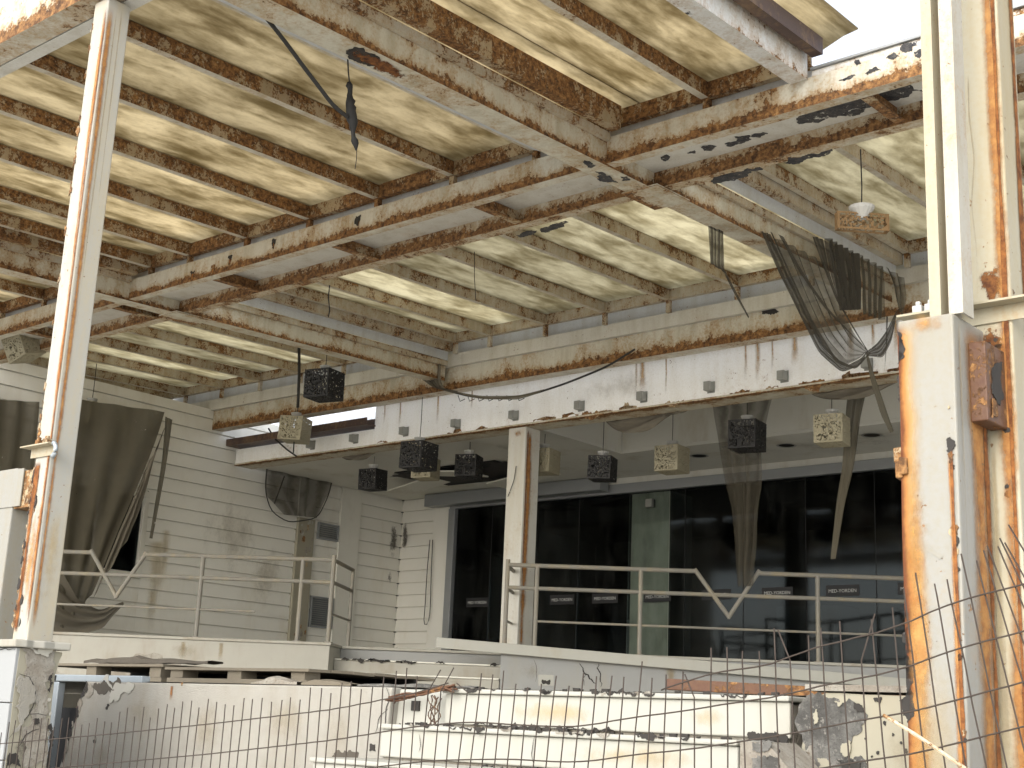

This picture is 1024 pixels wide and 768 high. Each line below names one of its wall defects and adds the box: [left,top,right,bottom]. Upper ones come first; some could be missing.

corrosion [346,47,405,78]
peeling [583,160,630,183]
peeling [796,99,871,124]
peeling [879,85,923,101]
corrosion [980,0,1008,300]
corrosion [1009,0,1024,293]
corrosion [14,17,111,629]
corrosion [946,437,967,768]
corrosion [967,321,1024,768]
spalling [6,641,134,768]
spalling [450,722,615,739]
spalling [747,692,868,768]